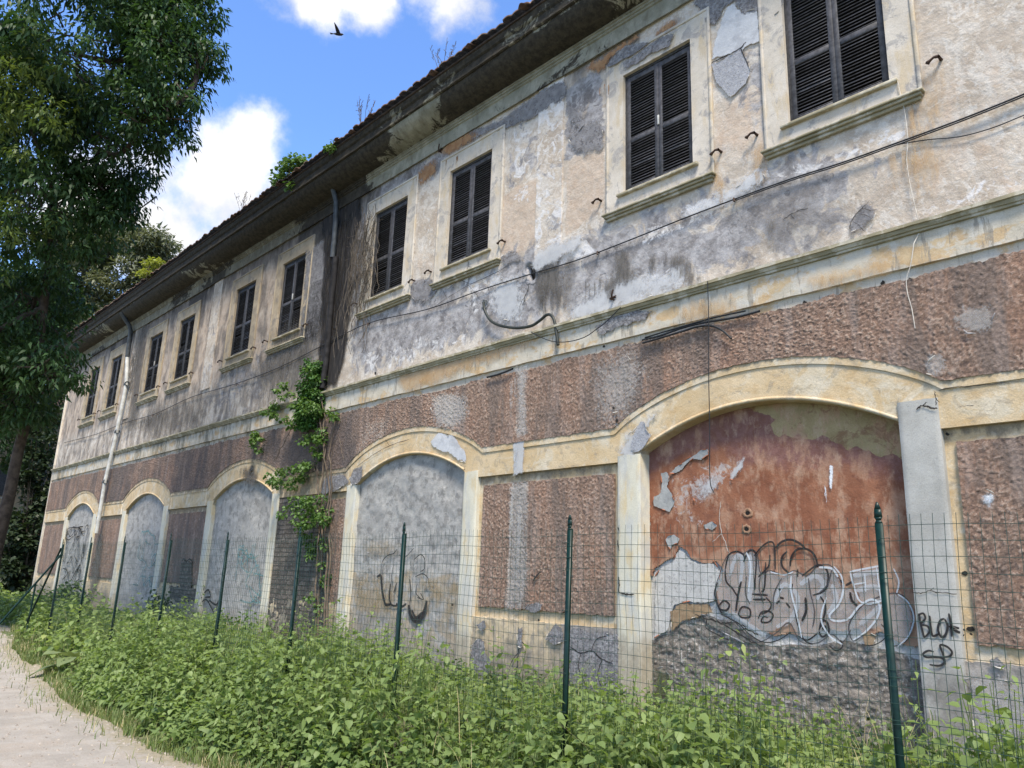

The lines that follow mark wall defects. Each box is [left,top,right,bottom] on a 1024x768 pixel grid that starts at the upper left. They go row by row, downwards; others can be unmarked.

peeling [693,0,762,96]
spalling [462,81,604,156]
spalling [849,204,876,233]
water stain [490,235,699,324]
peeling [431,433,466,462]
spalling [618,414,655,455]
peeling [653,449,709,512]
peeling [693,458,744,501]
peeling [654,534,721,638]